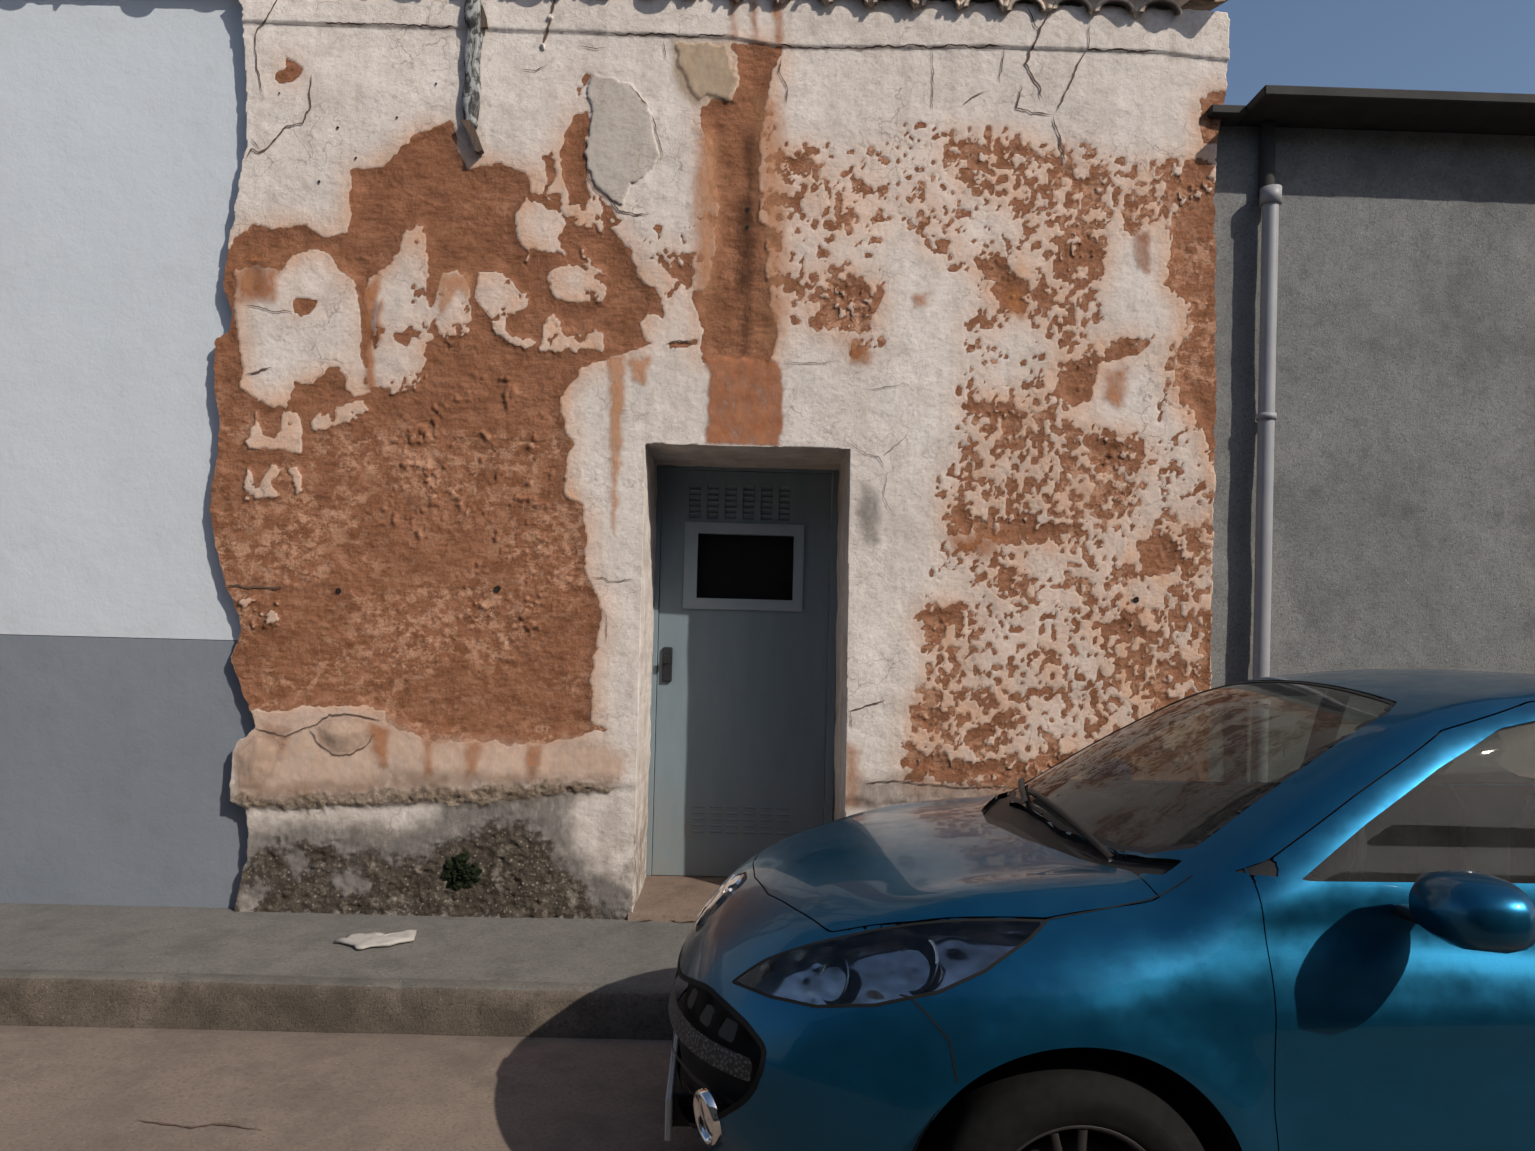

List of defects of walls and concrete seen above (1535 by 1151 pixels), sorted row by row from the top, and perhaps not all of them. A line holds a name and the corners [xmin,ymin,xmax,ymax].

crack [254,0,277,91]
crack [246,80,311,158]
crack [324,21,456,29]
crack [778,6,1179,160]
peeling [209,43,1226,791]
crack [254,713,382,756]
flaking render [231,779,619,920]
water stain [241,795,631,917]